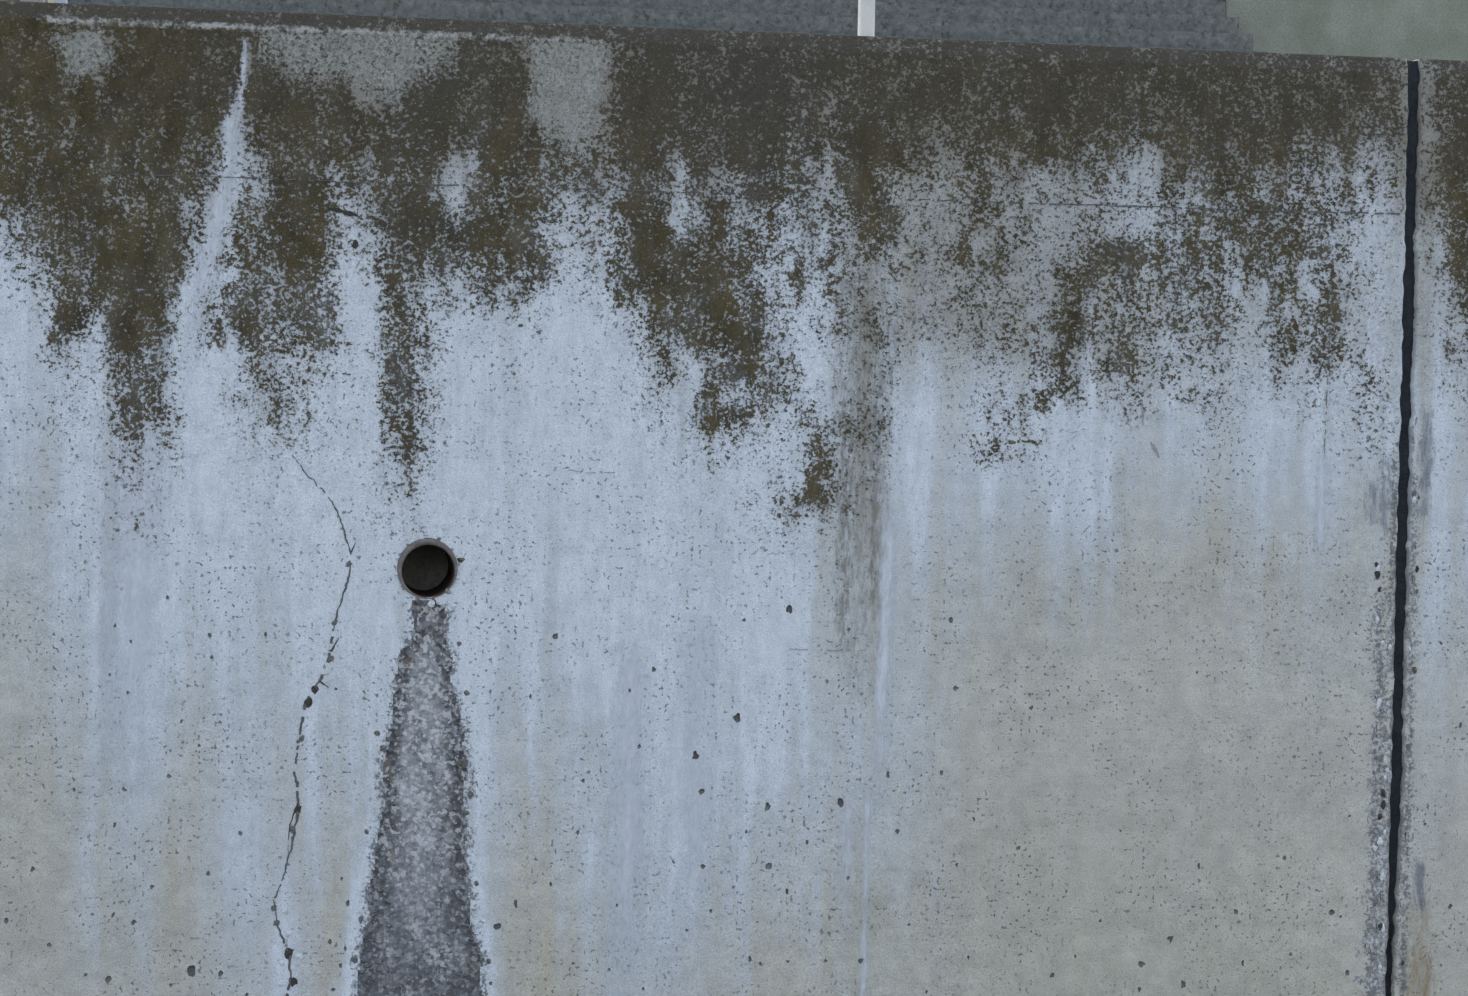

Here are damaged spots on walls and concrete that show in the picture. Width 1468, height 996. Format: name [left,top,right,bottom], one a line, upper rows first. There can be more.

damp [35,38,350,705]
damp [373,293,438,536]
damp [620,278,899,553]
damp [982,364,1039,475]
damp [1061,336,1171,427]
damp [1439,305,1468,435]
crack [271,455,356,996]